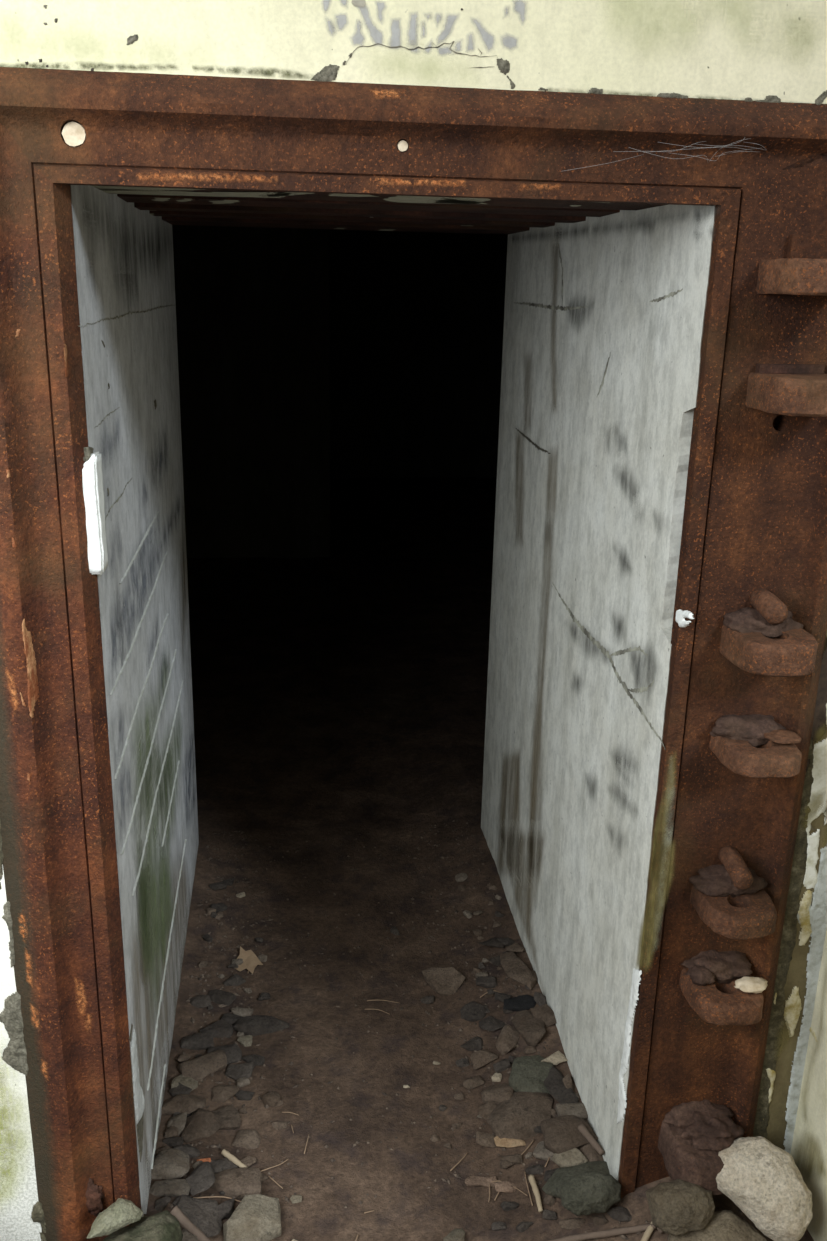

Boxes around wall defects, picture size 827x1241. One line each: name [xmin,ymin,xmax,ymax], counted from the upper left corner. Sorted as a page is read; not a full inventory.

crack [346,41,497,68]
rust [7,619,39,718]
leakage [111,508,179,658]
rust [723,607,804,638]
rust [710,714,786,747]
rust [499,689,542,939]
spalling [0,824,15,967]
rust [681,950,752,984]
spalling [734,703,827,1154]
spalling [0,992,28,1075]
leakage [136,877,187,1165]
rust [85,1178,105,1216]